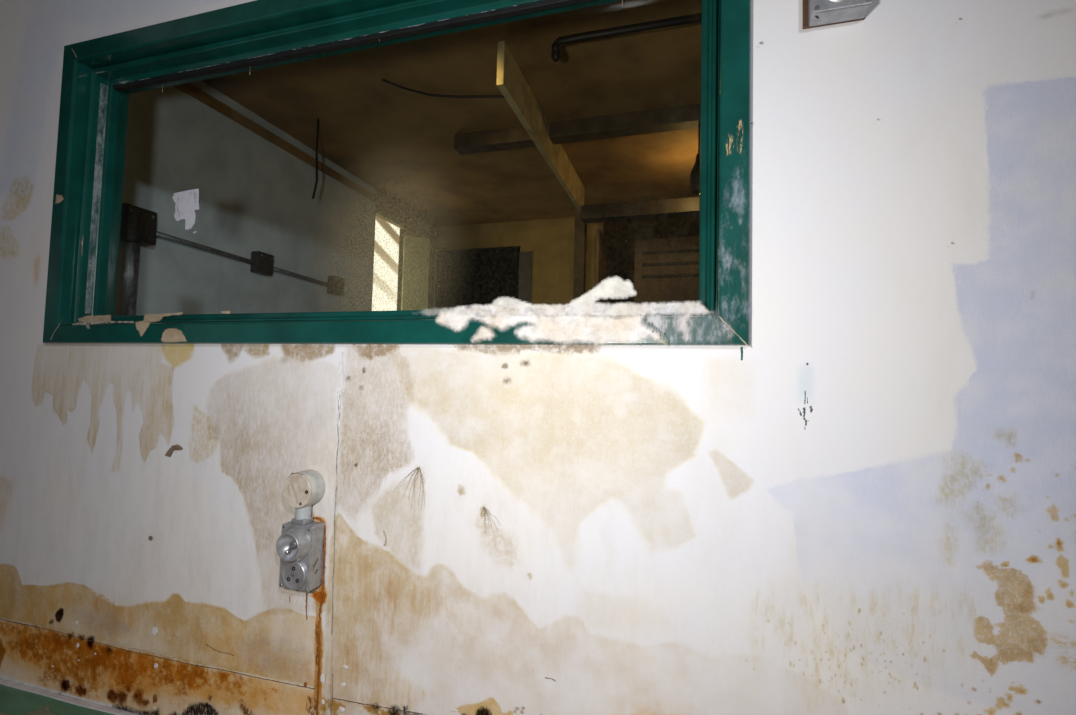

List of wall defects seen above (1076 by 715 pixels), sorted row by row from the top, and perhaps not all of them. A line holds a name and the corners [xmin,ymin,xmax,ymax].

peeling [73,312,186,342]
peeling [436,312,665,344]
leakage [395,467,425,510]
corrosion [304,516,326,715]
leakage [61,680,86,700]
leakage [107,687,159,715]
leakage [171,696,218,715]